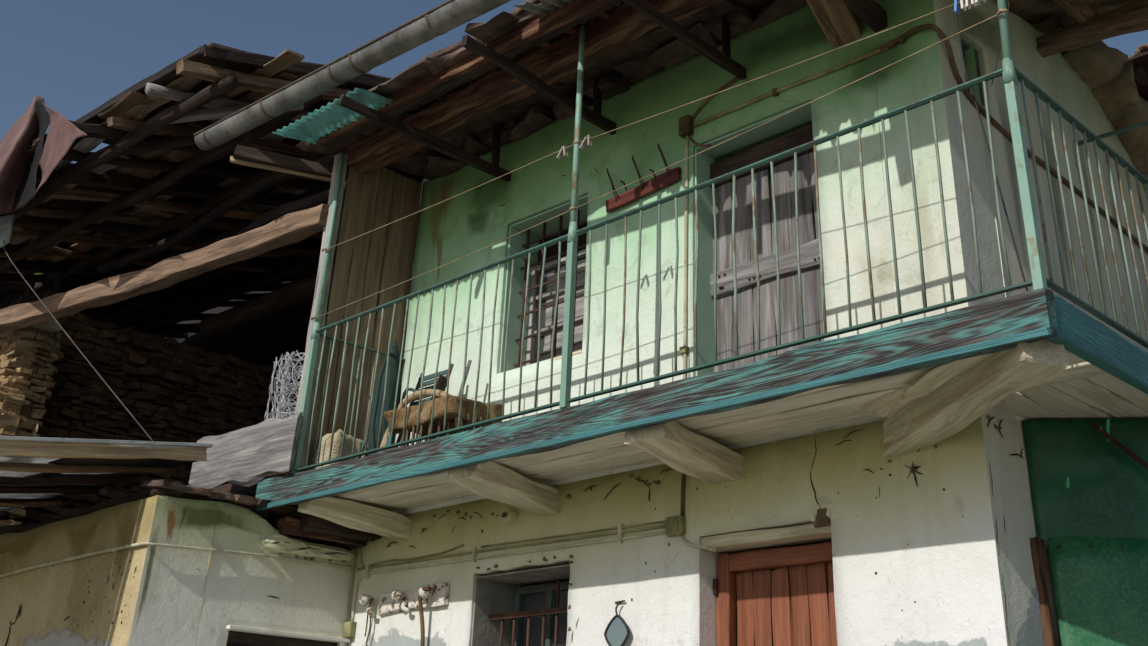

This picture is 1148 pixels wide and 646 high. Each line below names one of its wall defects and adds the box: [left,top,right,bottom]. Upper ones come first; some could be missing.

crack [810,439,821,509]
crack [4,606,22,646]